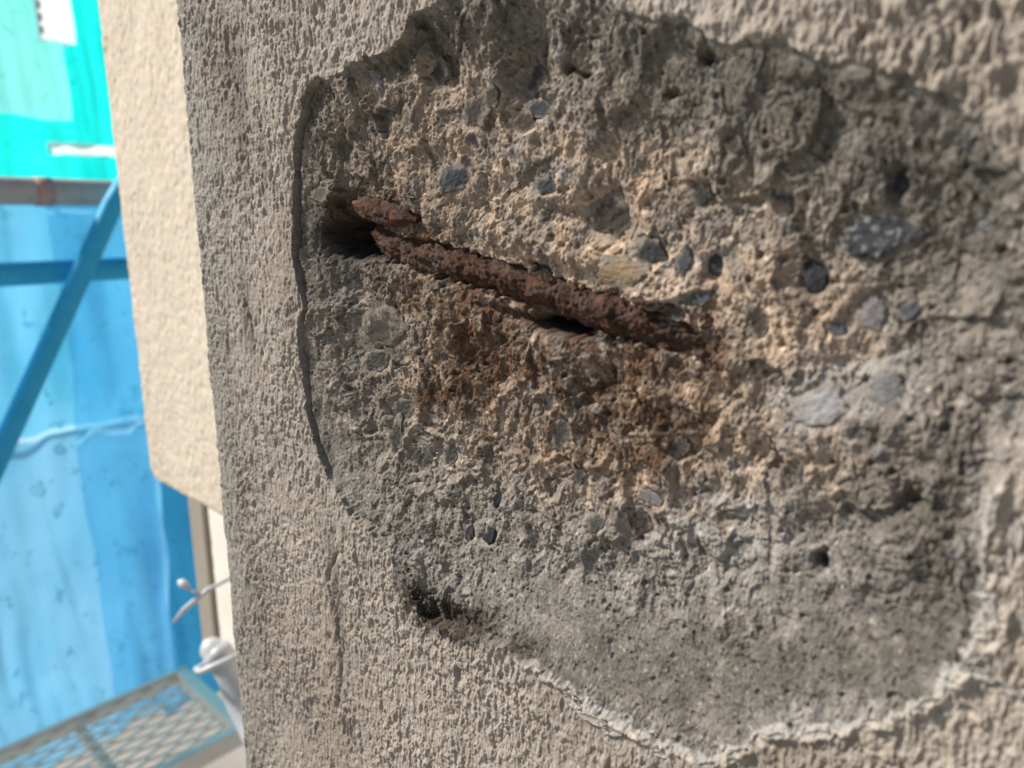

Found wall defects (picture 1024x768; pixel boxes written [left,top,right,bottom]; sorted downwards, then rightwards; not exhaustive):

rust [401,274,725,480]
spalling [291,0,1024,768]